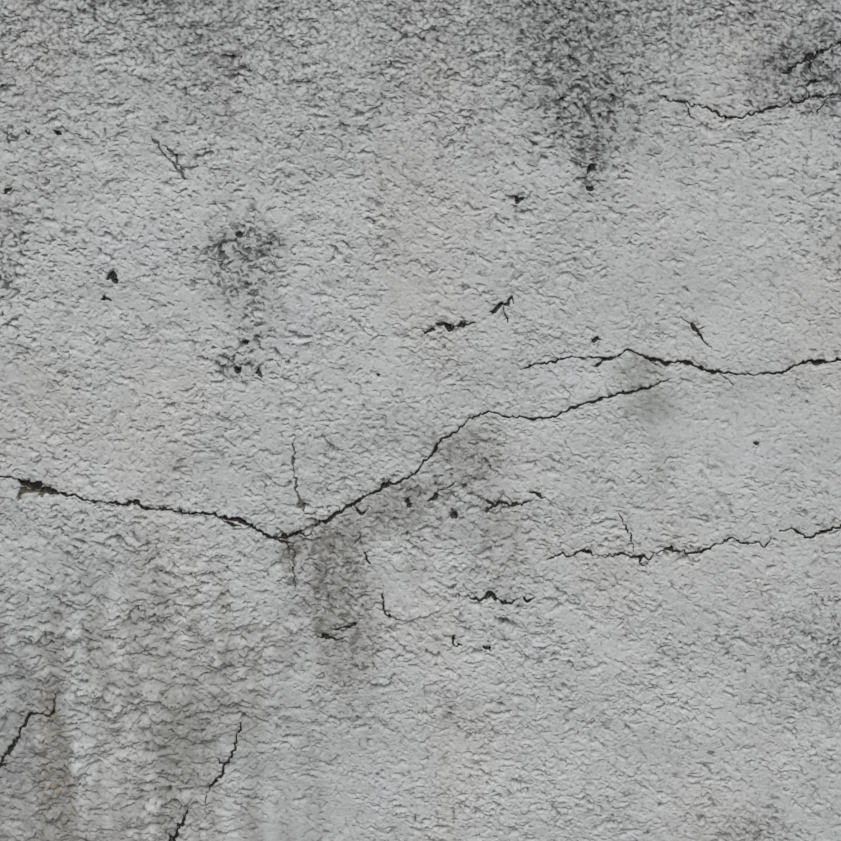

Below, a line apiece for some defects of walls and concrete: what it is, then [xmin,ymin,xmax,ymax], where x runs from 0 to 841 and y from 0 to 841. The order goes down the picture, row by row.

crack [661,41,841,119]
crack [682,319,712,348]
crack [0,349,841,587]
crack [381,593,401,620]
crack [0,694,57,778]
crack [169,720,243,841]